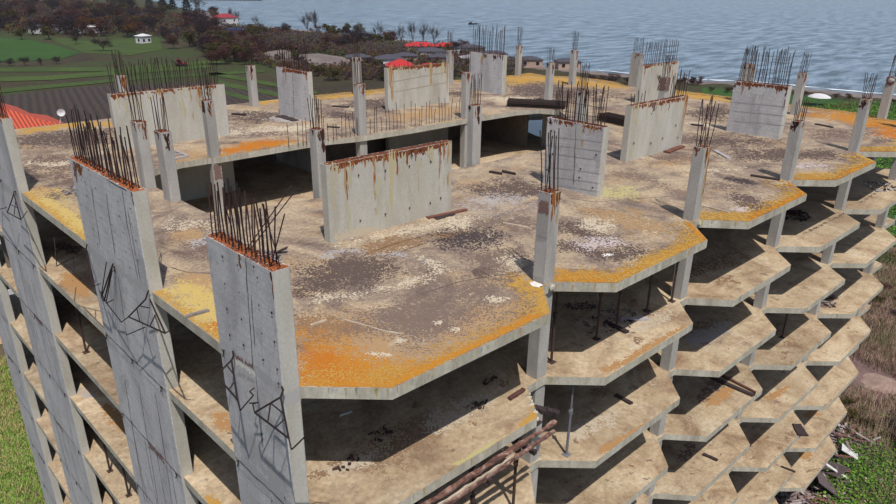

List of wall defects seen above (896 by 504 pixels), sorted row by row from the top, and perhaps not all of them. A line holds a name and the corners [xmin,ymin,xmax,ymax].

rust [277,66,311,81]
rust [110,74,222,119]
rust [294,51,896,388]